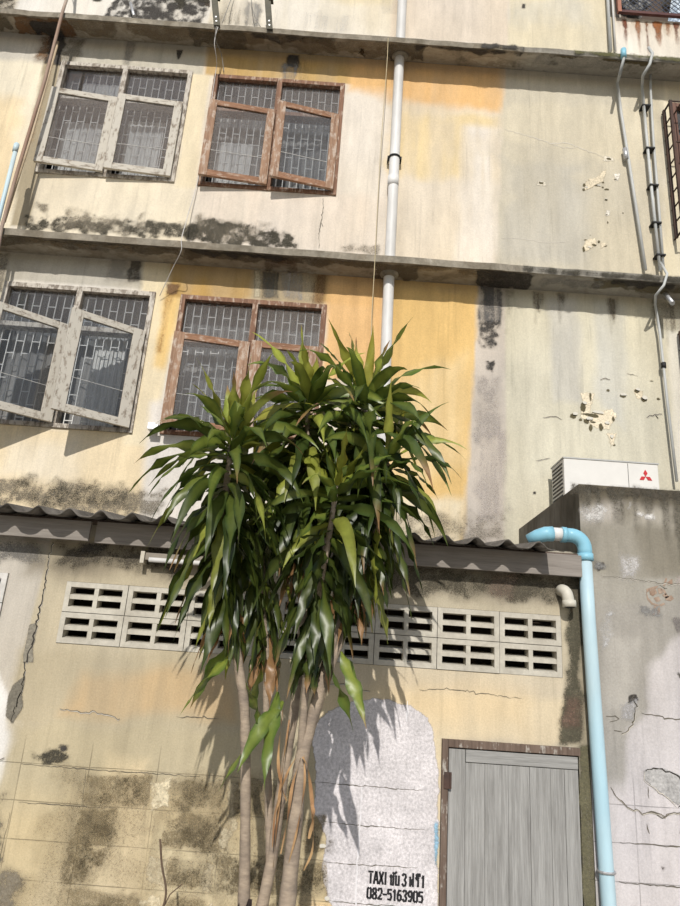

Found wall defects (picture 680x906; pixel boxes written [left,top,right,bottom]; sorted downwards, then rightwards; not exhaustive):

leakage [0,0,524,79]
rust [622,19,679,51]
peeling [583,156,620,223]
peeling [582,235,607,252]
leakage [0,204,680,348]
peeling [570,393,616,446]
crack [6,543,54,722]
crack [607,697,680,735]
leakage [37,745,68,764]
spalling [644,767,680,807]
leakage [0,774,291,906]
crack [611,788,680,847]